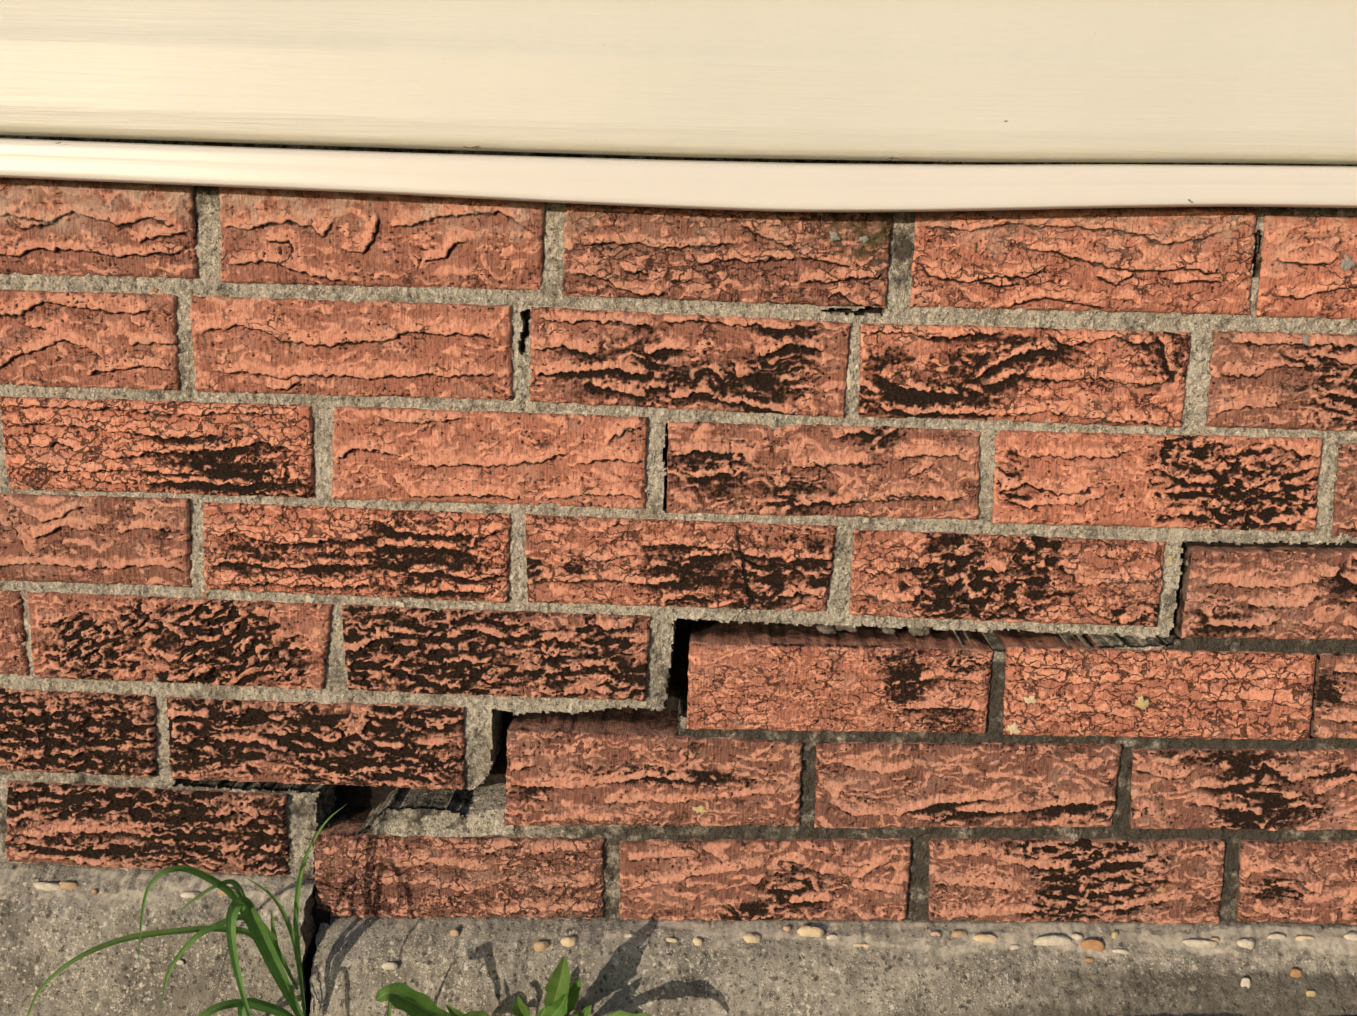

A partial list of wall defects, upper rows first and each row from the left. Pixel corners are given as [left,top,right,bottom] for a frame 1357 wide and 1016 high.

crack [520,309,531,353]
crack [822,307,882,315]
crack [662,423,670,511]
crack [1180,541,1357,554]
crack [612,525,800,711]
crack [477,711,514,788]
crack [320,784,397,829]
crack [310,888,331,991]